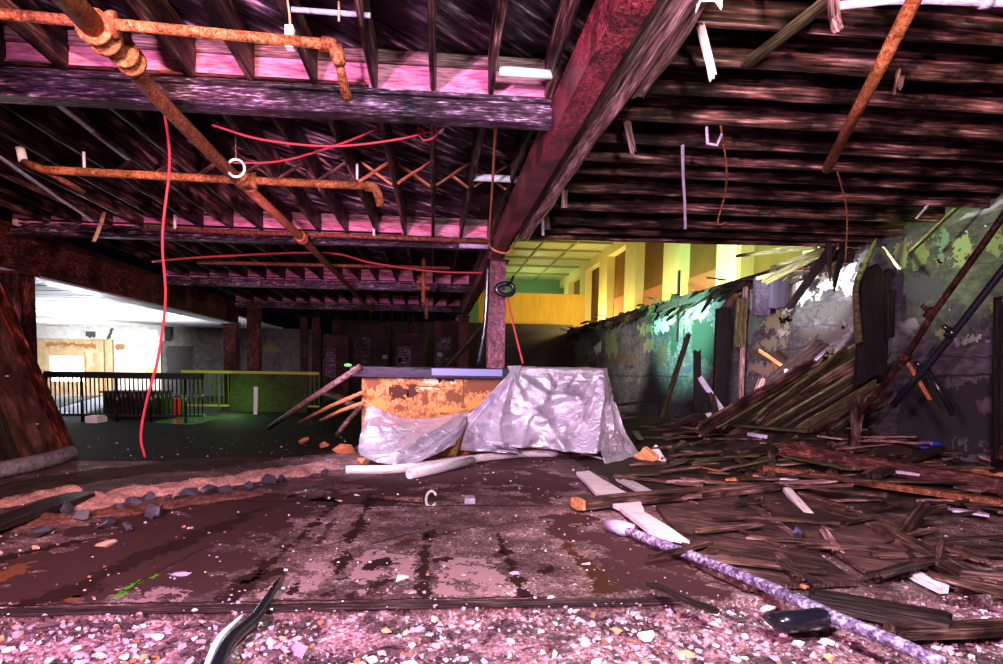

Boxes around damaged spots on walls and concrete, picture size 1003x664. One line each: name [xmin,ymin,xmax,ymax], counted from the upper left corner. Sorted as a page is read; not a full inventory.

spalling [741,258,859,379]
rust [364,377,502,416]